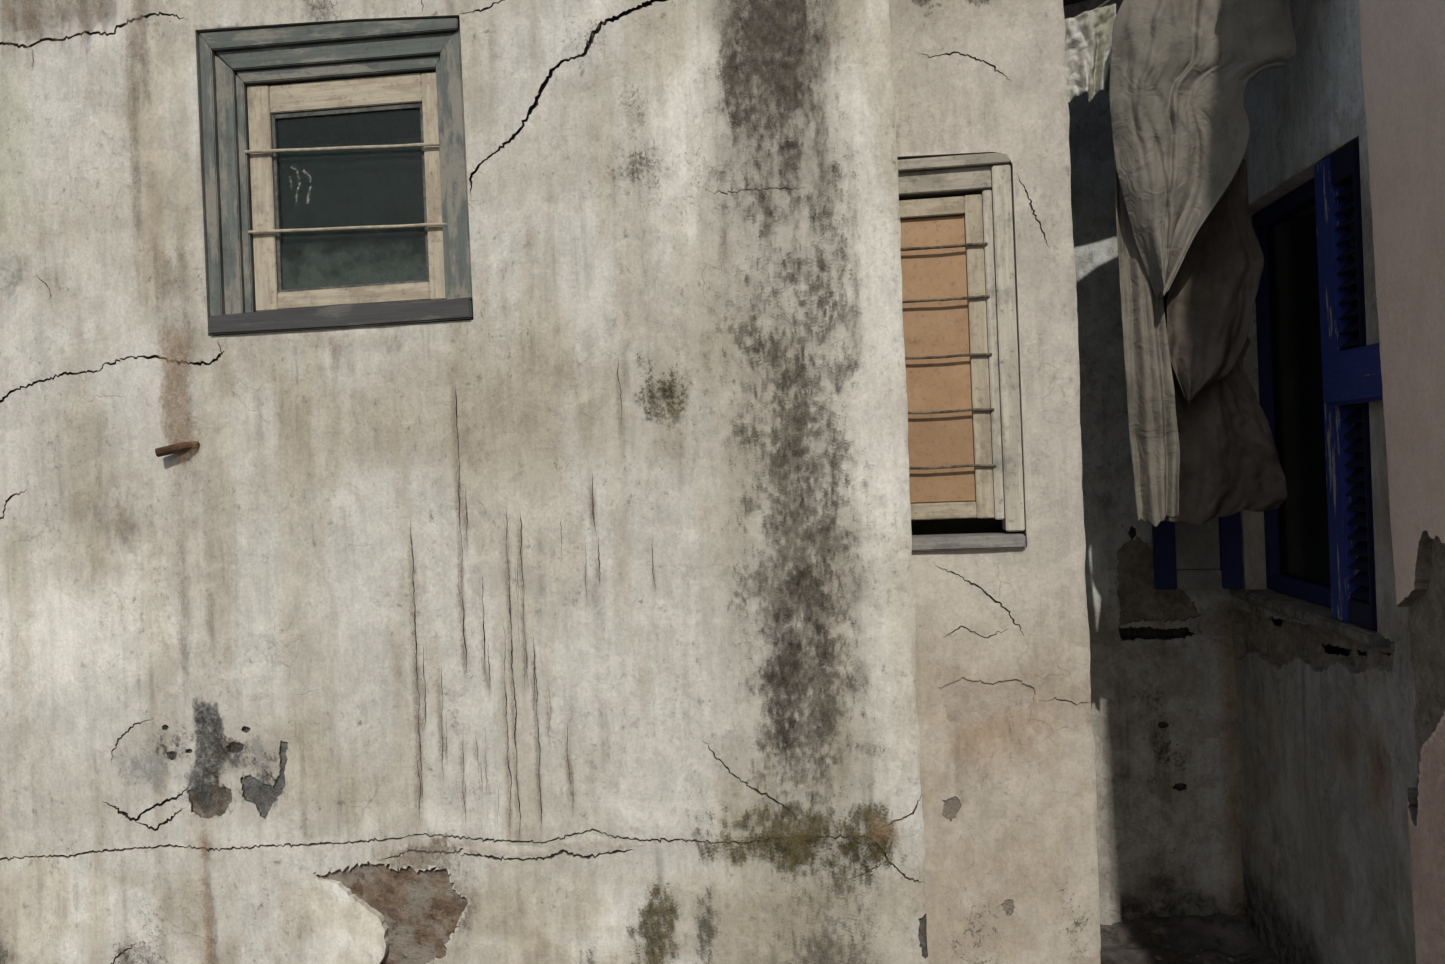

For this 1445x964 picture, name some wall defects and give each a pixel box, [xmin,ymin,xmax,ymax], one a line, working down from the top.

crack [0,12,187,63]
crack [469,0,668,198]
crack [0,343,224,403]
rust [157,322,198,474]
leakage [683,0,856,777]
crack [0,386,925,884]
crack [935,565,1024,638]
flaking render [1233,530,1445,827]
flaking render [187,741,288,819]
spalling [228,726,251,753]
flaking render [313,861,468,964]
leakage [694,878,718,964]